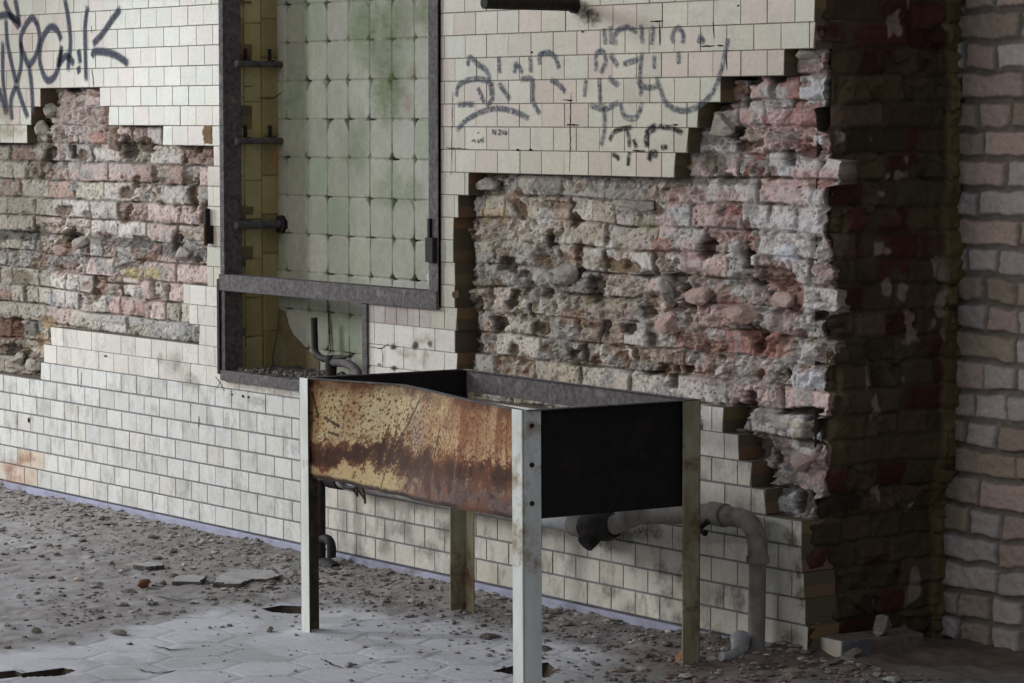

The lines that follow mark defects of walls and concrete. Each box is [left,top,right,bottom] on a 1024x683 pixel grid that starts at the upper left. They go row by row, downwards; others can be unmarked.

spalling [0,88,214,377]
spalling [452,49,859,524]